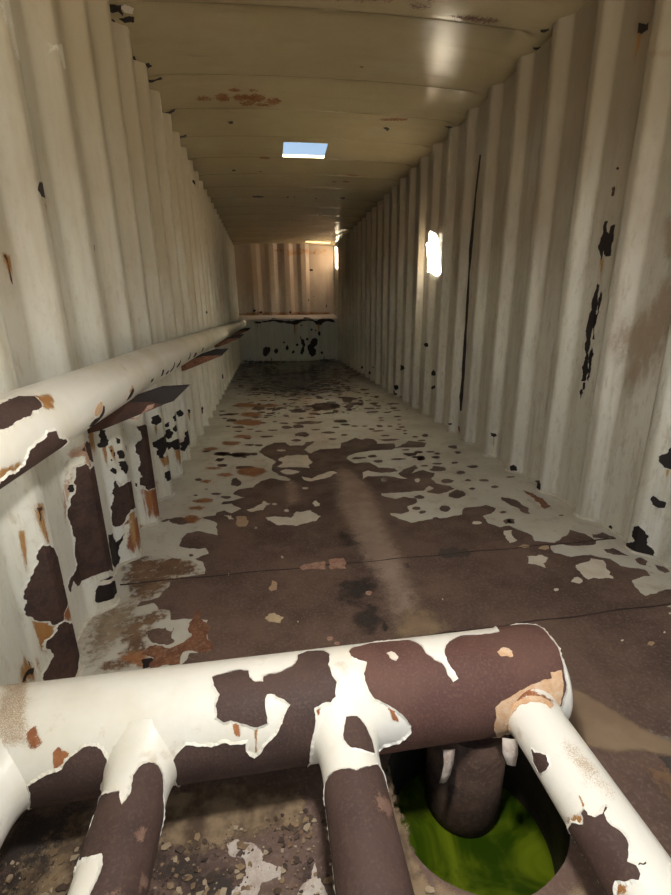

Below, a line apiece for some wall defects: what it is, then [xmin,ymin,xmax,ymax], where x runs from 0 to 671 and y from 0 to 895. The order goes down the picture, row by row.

rust [196,86,284,107]
peeling [254,317,335,357]
peeling [580,221,615,398]
peeling [0,395,671,895]